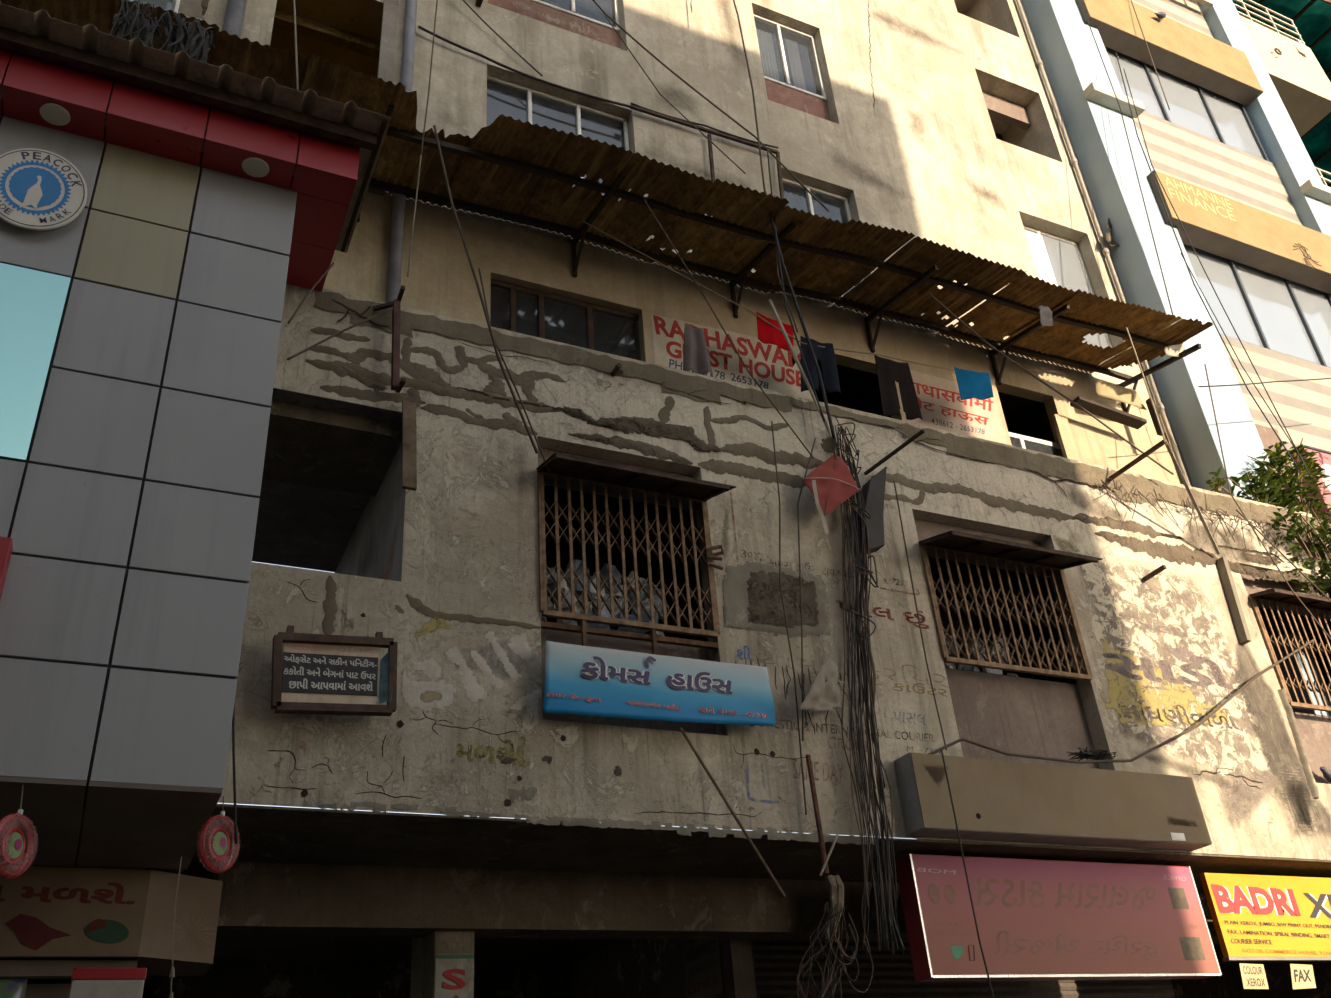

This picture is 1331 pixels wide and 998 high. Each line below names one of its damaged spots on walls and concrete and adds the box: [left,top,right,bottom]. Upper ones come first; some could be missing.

flaking render [564,406,721,453]
peeling [1072,550,1277,821]
crack [413,710,517,743]
crack [267,736,422,799]